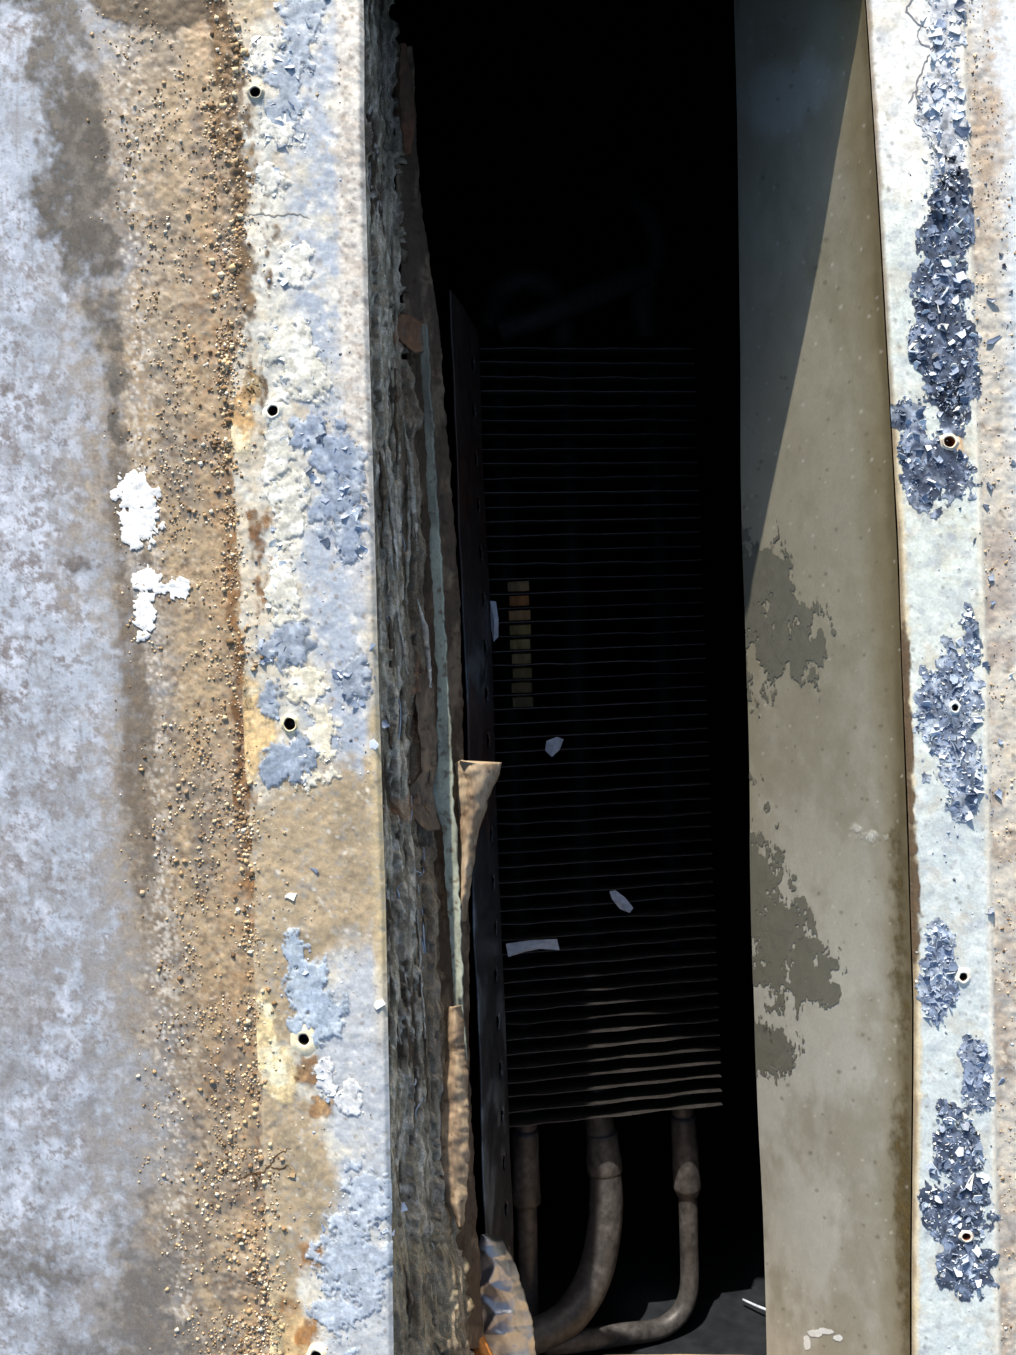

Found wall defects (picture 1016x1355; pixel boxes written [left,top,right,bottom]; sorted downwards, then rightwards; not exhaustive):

rust [208,0,278,320]
peeling [890,0,1013,519]
rust [230,362,268,453]
rust [224,509,276,811]
peeling [243,306,376,795]
peeling [911,602,1002,822]
crack [230,1148,291,1191]
rust [270,1301,317,1355]
rust [256,994,333,1118]
peeling [280,928,363,1116]
peeling [304,1153,408,1355]
peeling [914,917,1005,1302]